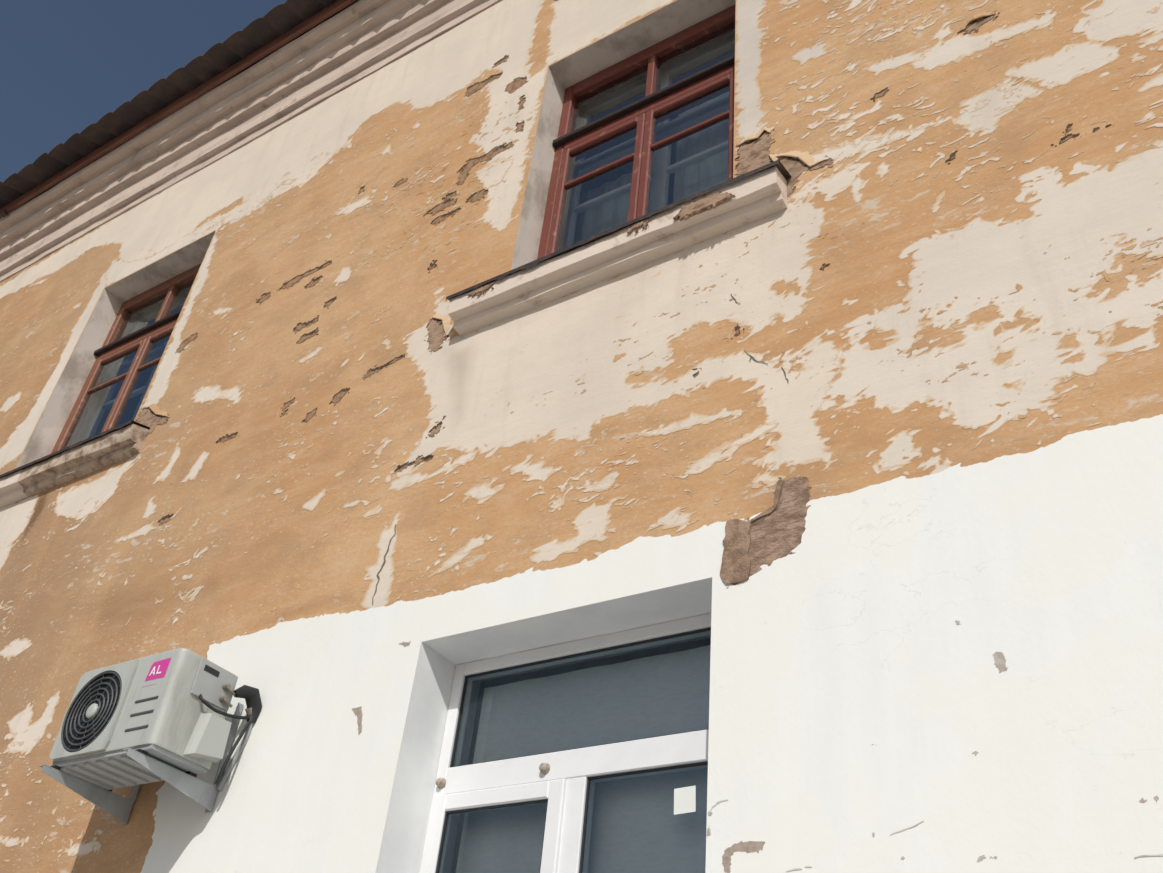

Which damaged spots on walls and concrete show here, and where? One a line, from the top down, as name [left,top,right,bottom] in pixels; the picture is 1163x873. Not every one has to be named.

peeling [0,0,673,673]
peeling [221,0,1163,609]
crack [372,524,396,604]
peeling [993,652,1008,673]
peeling [352,706,363,735]
peeling [722,841,765,873]